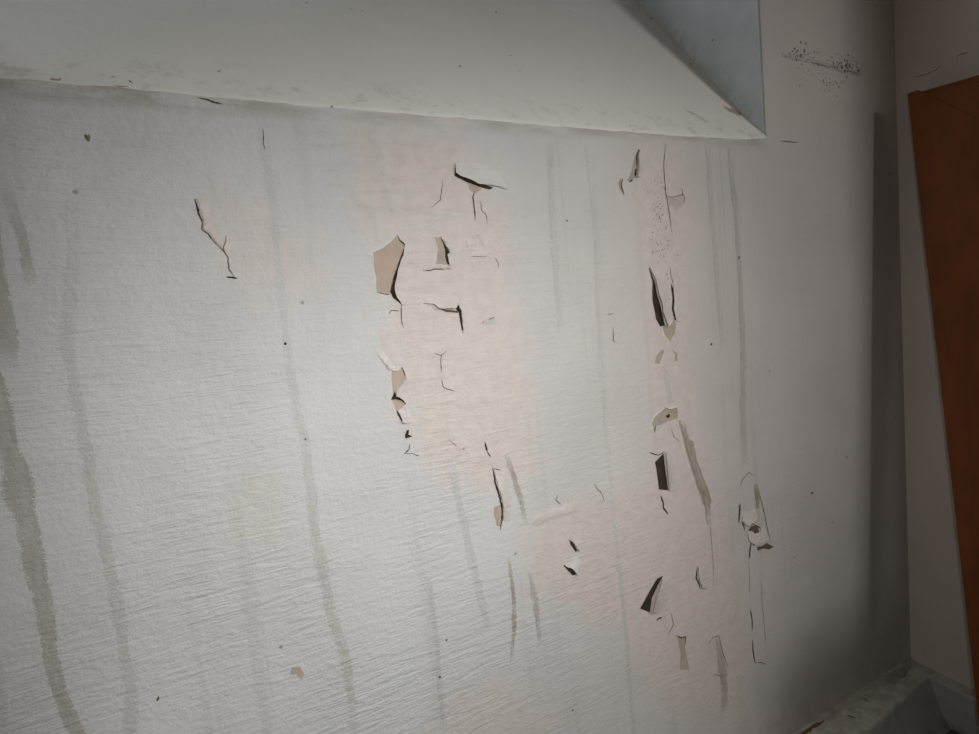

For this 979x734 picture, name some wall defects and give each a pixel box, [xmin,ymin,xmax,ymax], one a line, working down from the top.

crack [195,198,237,279]
peeling [370,232,457,328]
peeling [455,161,507,224]
peeling [618,149,647,194]
peeling [649,267,680,364]
water stain [0,181,87,734]
water stain [57,186,140,734]
peeling [378,352,419,456]
water stain [165,108,760,734]
peeling [649,406,712,543]
peeling [739,472,773,559]
peeling [640,576,689,670]